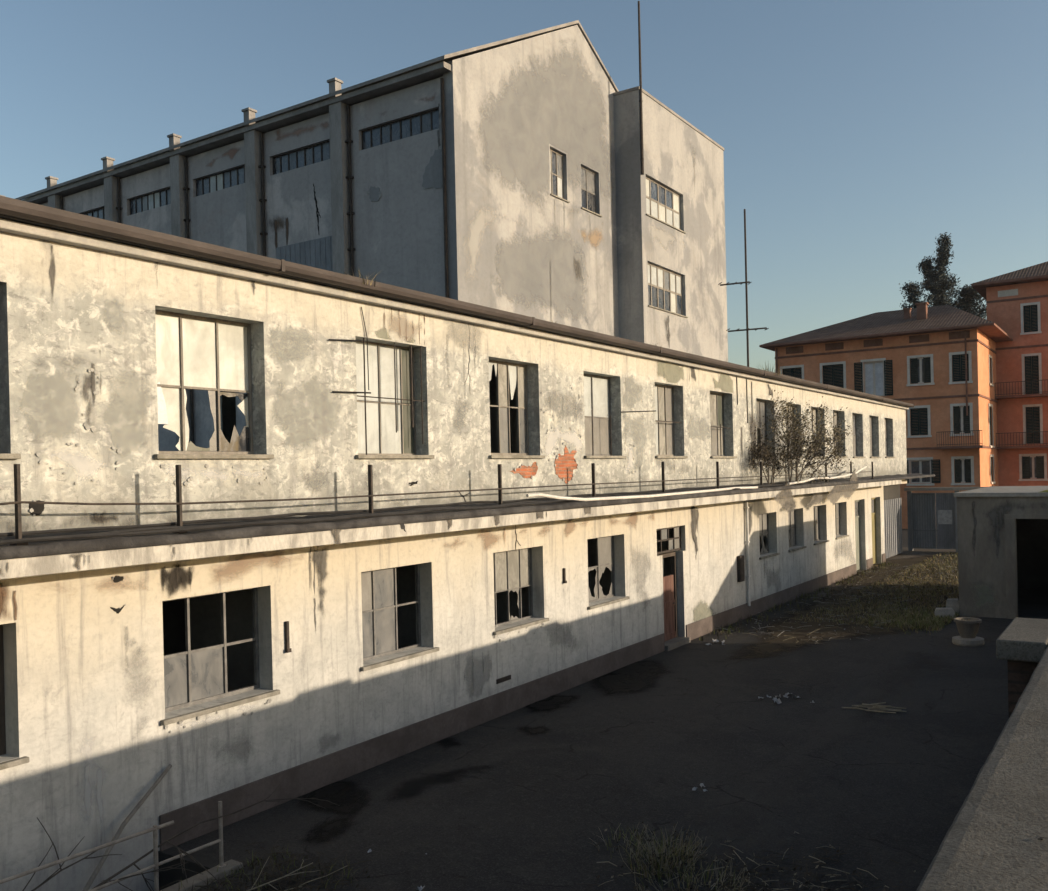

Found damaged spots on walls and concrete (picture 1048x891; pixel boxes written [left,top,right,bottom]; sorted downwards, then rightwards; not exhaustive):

rust [273,218,288,248]
flaking render [511,409,582,484]
water stain [691,506,699,552]
water stain [161,544,192,590]
water stain [310,529,341,628]